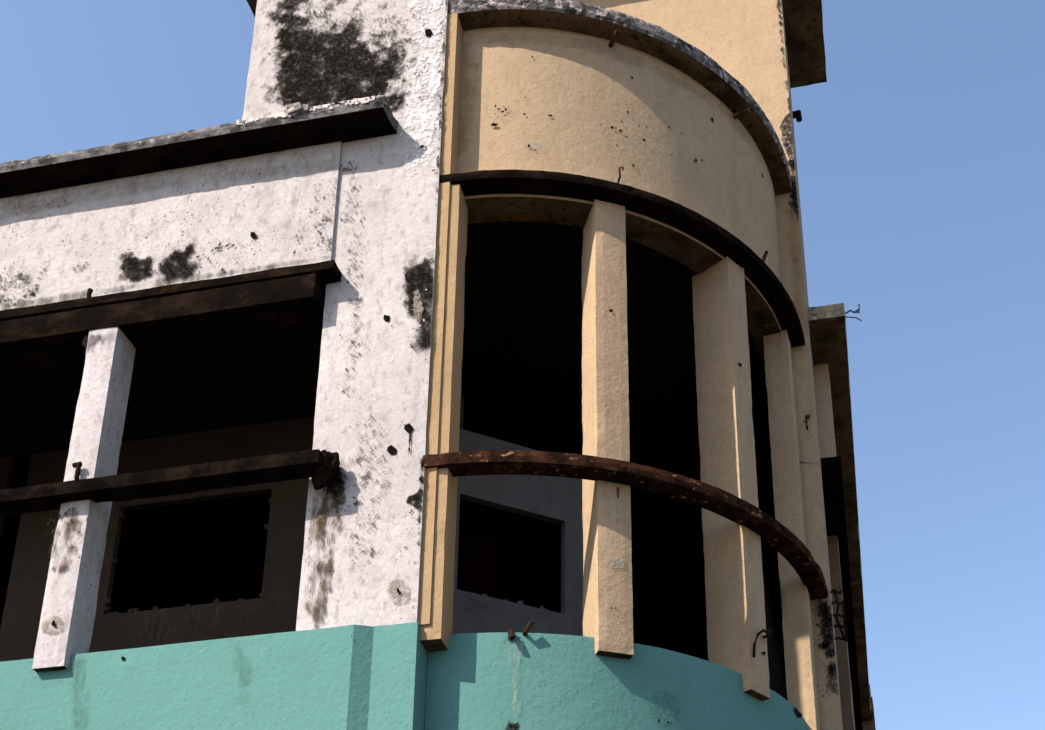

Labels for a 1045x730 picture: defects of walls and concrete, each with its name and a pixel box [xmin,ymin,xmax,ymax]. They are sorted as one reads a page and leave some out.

leakage [266,0,428,112]
leakage [788,160,799,217]
leakage [118,238,236,292]
leakage [403,258,434,360]
leakage [327,461,350,516]
leakage [816,599,838,696]